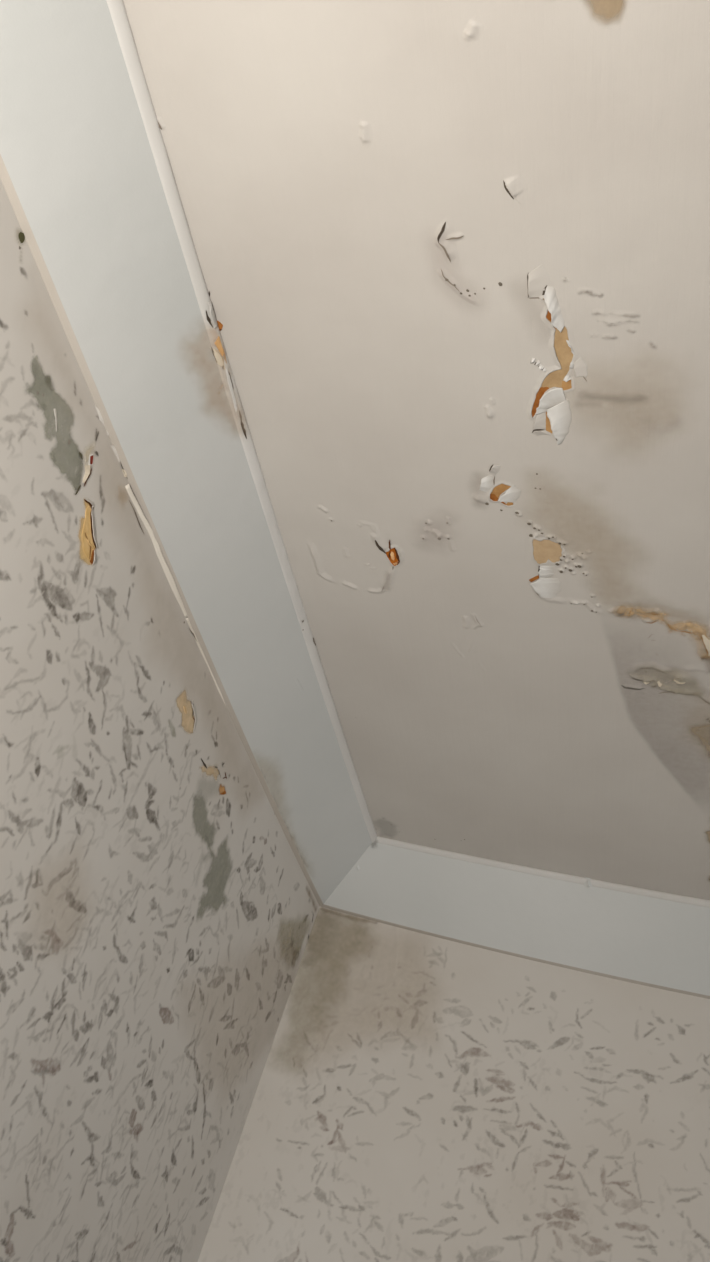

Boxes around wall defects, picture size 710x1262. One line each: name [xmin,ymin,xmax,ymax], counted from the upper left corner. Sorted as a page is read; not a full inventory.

leakage [588,0,623,20]
peeling [526,264,588,445]
peeling [470,465,593,604]
leakage [617,605,710,671]